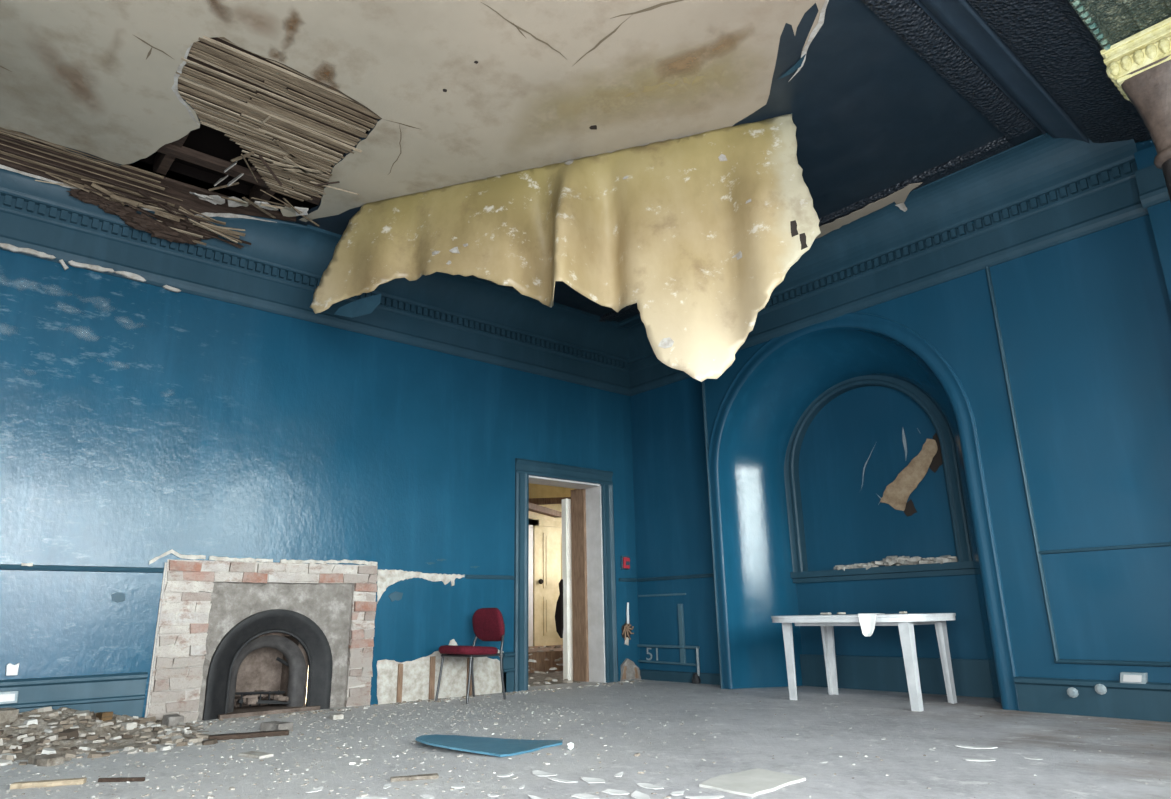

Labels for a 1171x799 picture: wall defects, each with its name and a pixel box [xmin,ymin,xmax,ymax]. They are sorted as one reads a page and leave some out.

flaking render [0,0,922,382]
peeling [376,639,506,704]